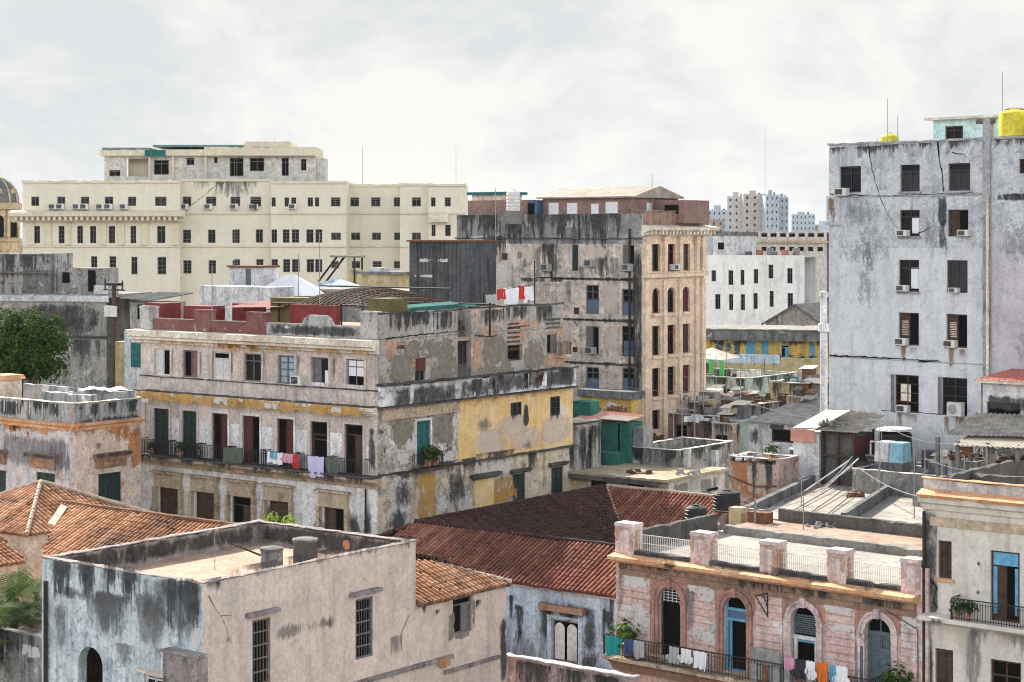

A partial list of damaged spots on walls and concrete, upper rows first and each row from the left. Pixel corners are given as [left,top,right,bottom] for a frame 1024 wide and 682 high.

crack [830,141,975,222]
damp [938,190,946,248]
damp [390,214,642,407]
flaking render [472,319,571,384]
damp [97,451,193,466]
peeling [368,412,475,523]
damp [443,449,513,511]
peeling [480,415,570,504]
damp [52,472,411,629]
peeling [623,575,648,590]
peeling [687,584,715,603]
peeling [823,605,853,635]